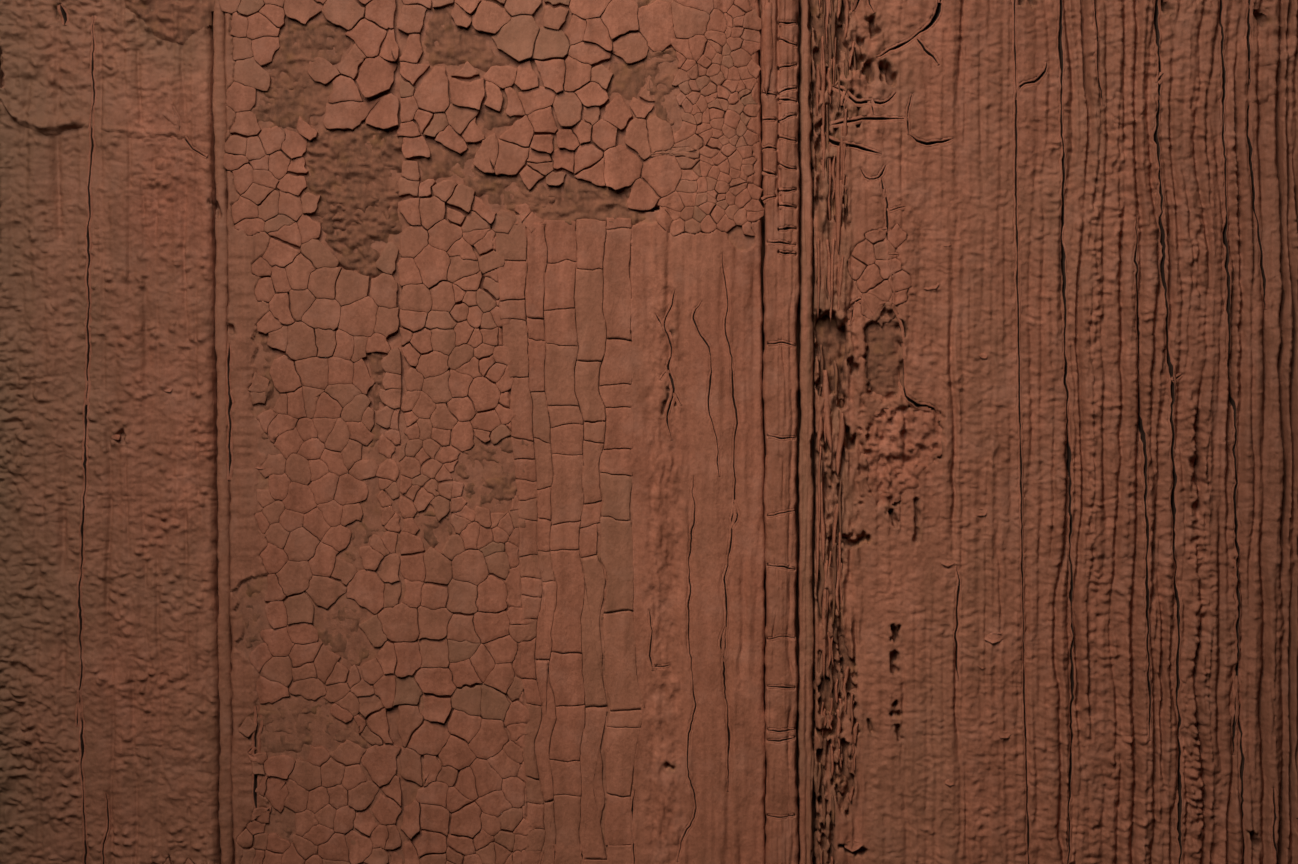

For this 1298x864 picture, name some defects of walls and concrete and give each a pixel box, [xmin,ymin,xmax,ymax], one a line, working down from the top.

peeling [125,0,682,281]
crack [226,0,953,864]
spalling [863,306,942,505]
crack [1011,0,1105,864]
crack [1132,0,1184,864]
crack [1218,0,1298,864]